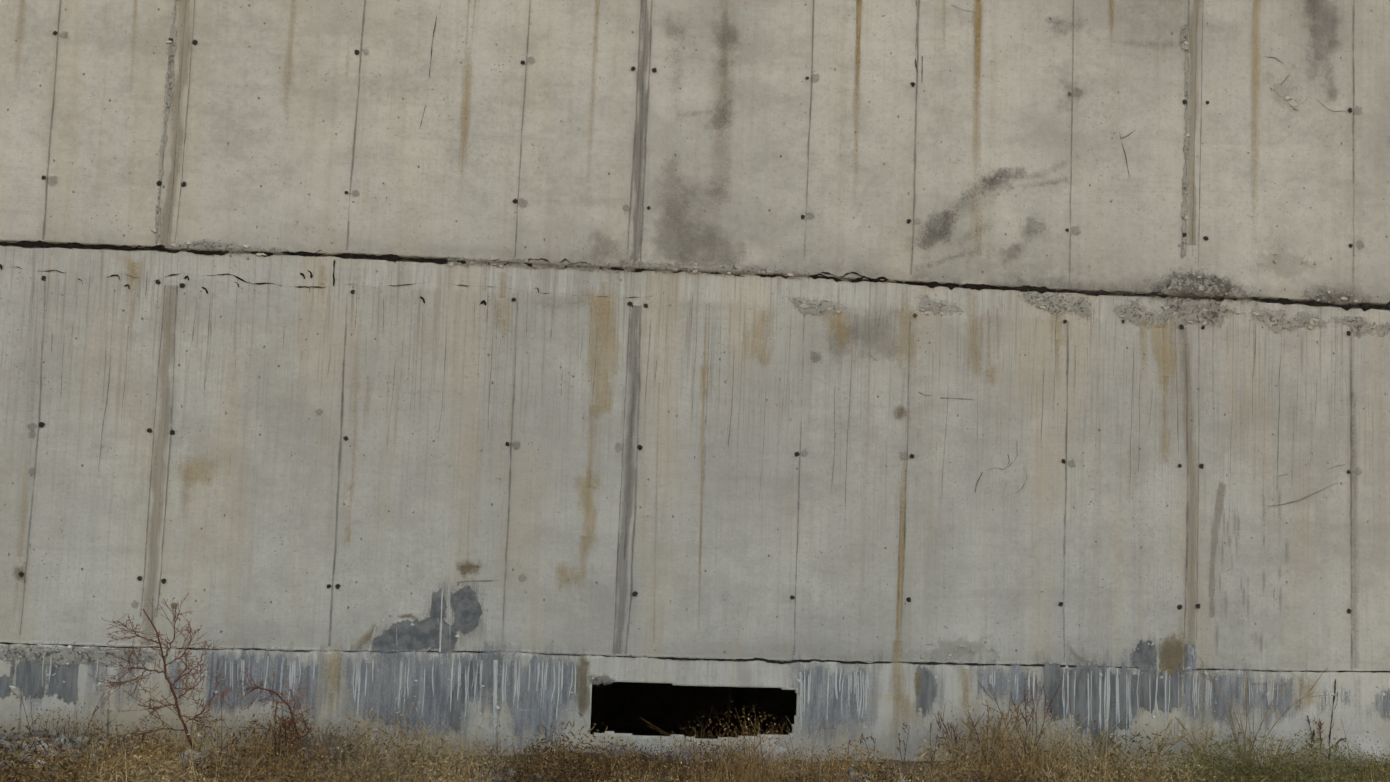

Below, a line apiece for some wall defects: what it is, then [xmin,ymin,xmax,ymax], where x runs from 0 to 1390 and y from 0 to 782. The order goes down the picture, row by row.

spalling [1018,291,1096,323]
spalling [1114,25,1390,337]